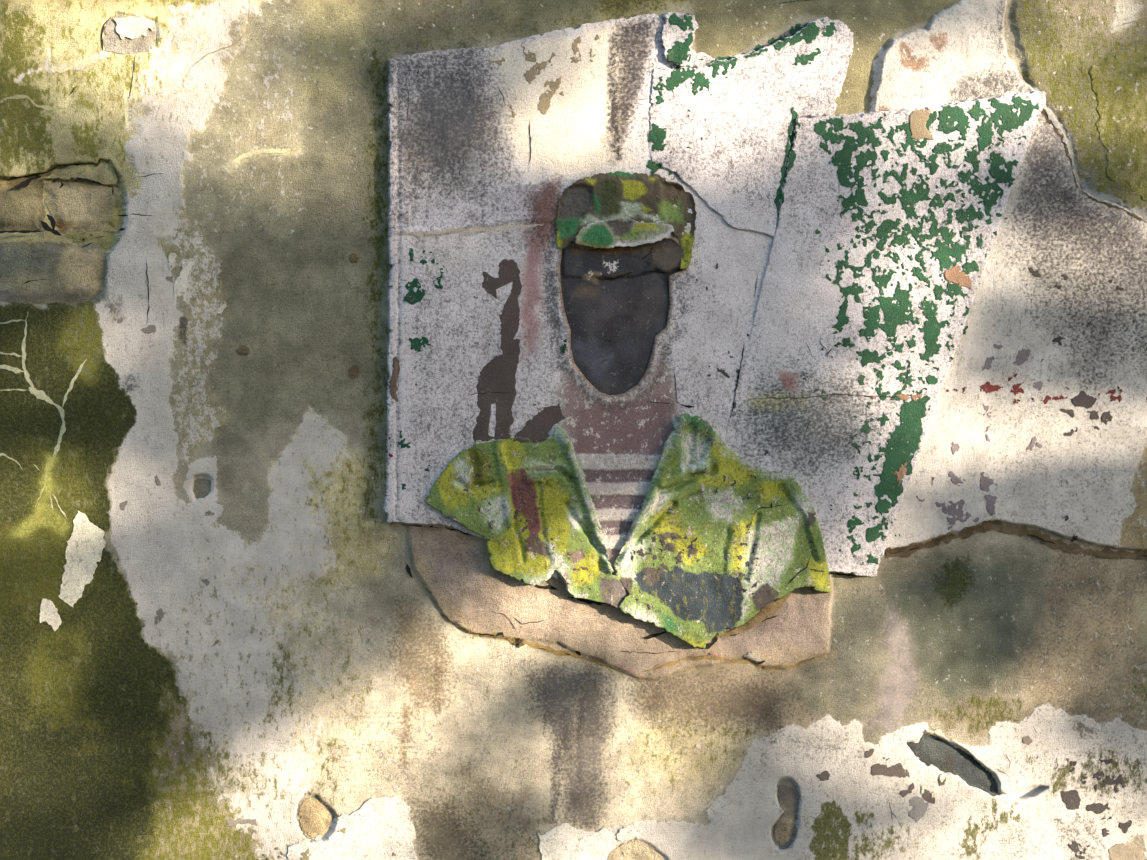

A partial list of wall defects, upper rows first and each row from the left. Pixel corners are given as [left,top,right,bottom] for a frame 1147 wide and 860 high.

peeling [654,13,837,105]
peeling [646,123,672,175]
crack [0,160,164,247]
peeling [774,96,1147,576]
crack [0,312,87,517]
water stain [9,454,71,540]
peeling [40,511,106,631]
spalling [441,592,829,676]
peeling [537,823,665,860]
spalling [771,778,801,849]
spalling [864,729,1001,823]
peeling [1061,758,1143,860]